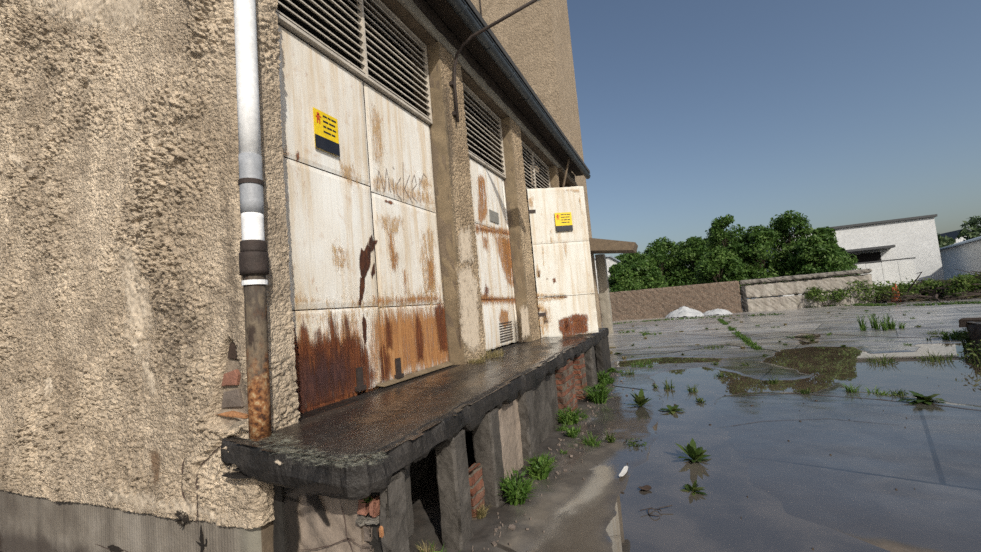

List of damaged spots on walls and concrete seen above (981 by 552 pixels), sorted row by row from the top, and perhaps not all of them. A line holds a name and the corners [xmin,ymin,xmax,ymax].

spalling [216,341,248,428]
corrosion [293,178,449,414]
corrosion [476,176,515,328]
corrosion [536,293,588,336]